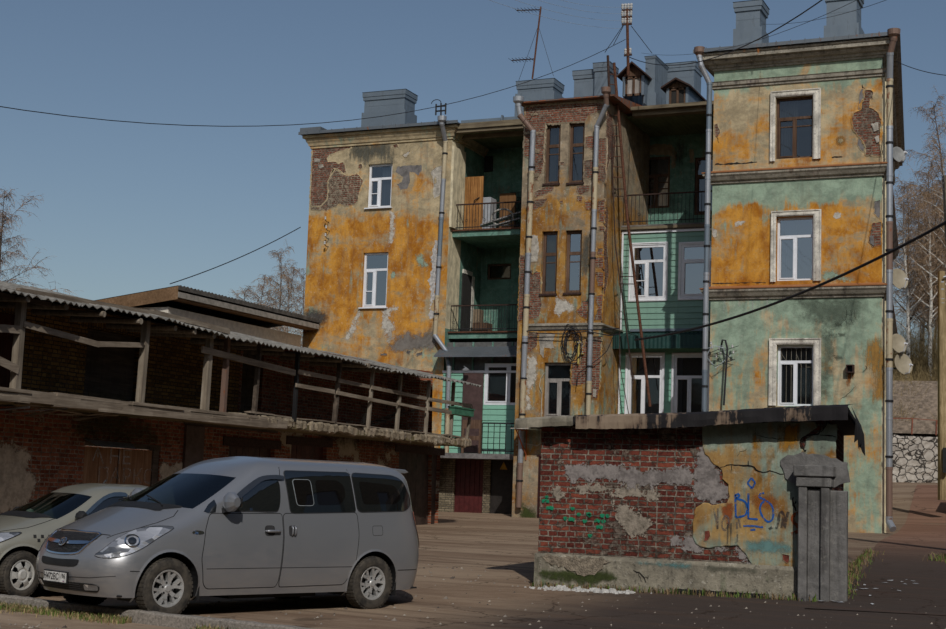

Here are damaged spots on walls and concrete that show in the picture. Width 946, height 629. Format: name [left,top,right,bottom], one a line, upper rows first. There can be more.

flaking render [850,88,884,158]
flaking render [309,147,363,211]
flaking render [523,101,616,322]
flaking render [517,234,556,359]
peeling [562,441,728,505]
crack [724,452,783,475]
crack [755,423,835,452]
peeling [670,530,750,564]